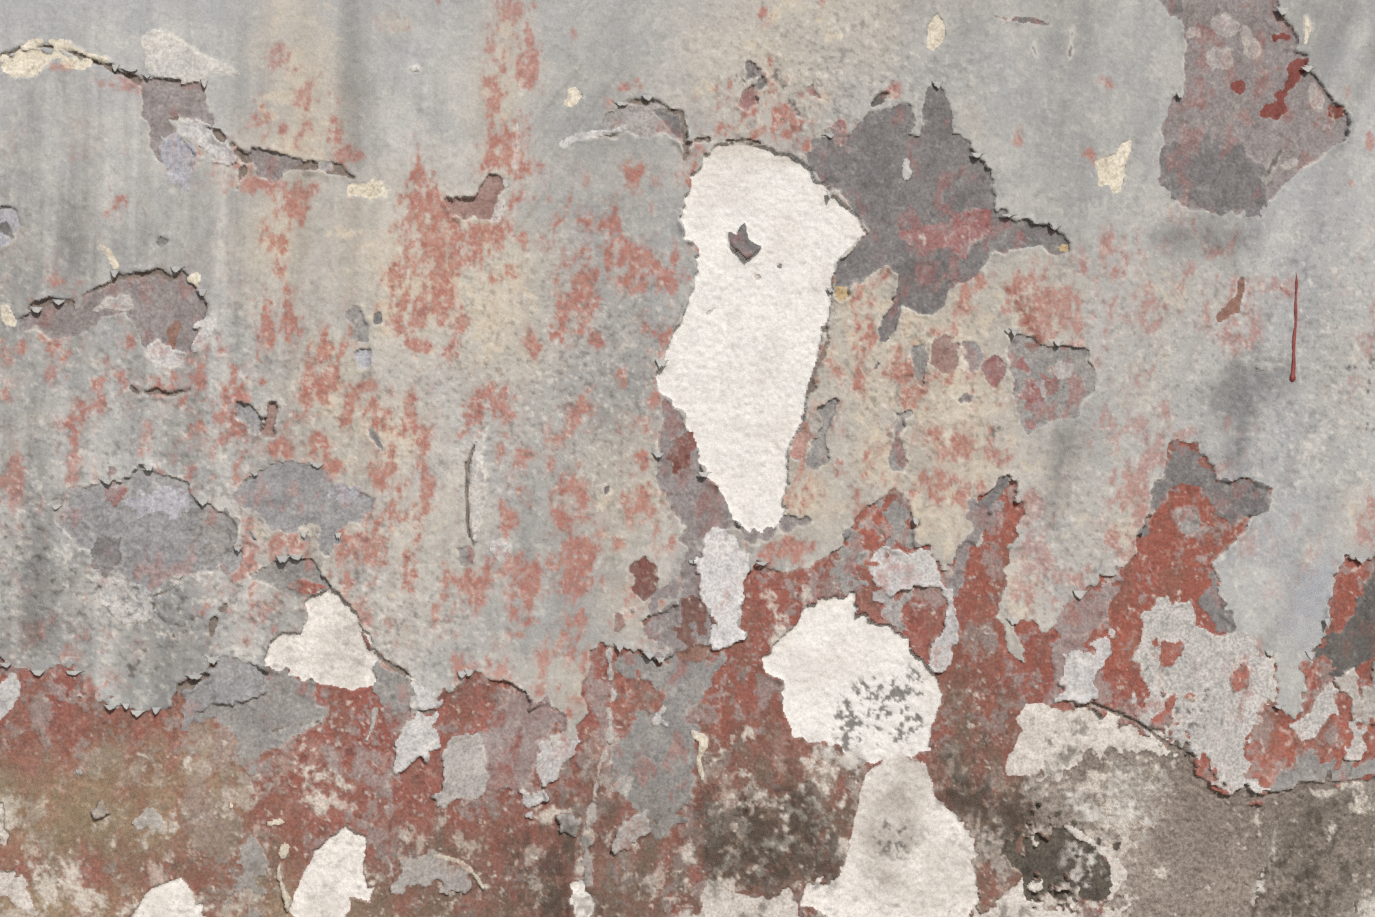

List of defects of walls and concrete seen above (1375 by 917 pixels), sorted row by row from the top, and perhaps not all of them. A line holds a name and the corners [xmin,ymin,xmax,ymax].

peeling [140,29,304,192]
peeling [1157,0,1350,217]
peeling [0,207,21,247]
peeling [1,245,216,369]
peeling [236,402,278,437]
peeling [369,427,383,451]
flaking render [630,81,1096,654]
peeling [0,439,1375,917]